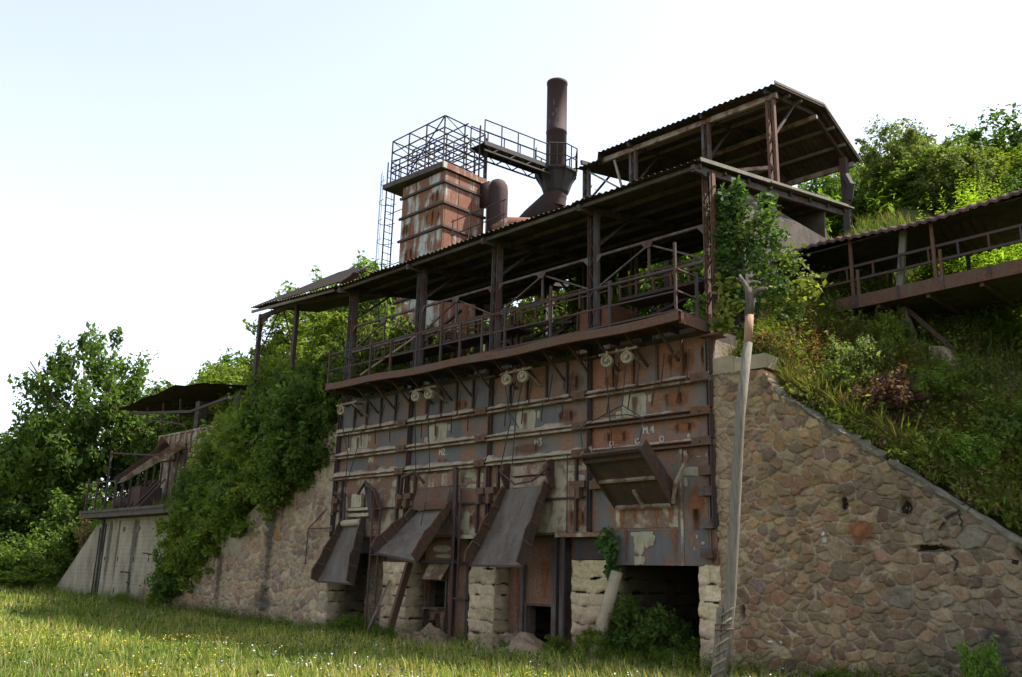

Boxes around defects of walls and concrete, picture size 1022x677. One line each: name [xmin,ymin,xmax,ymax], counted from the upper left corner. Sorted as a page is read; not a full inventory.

peeling [624,529,655,565]